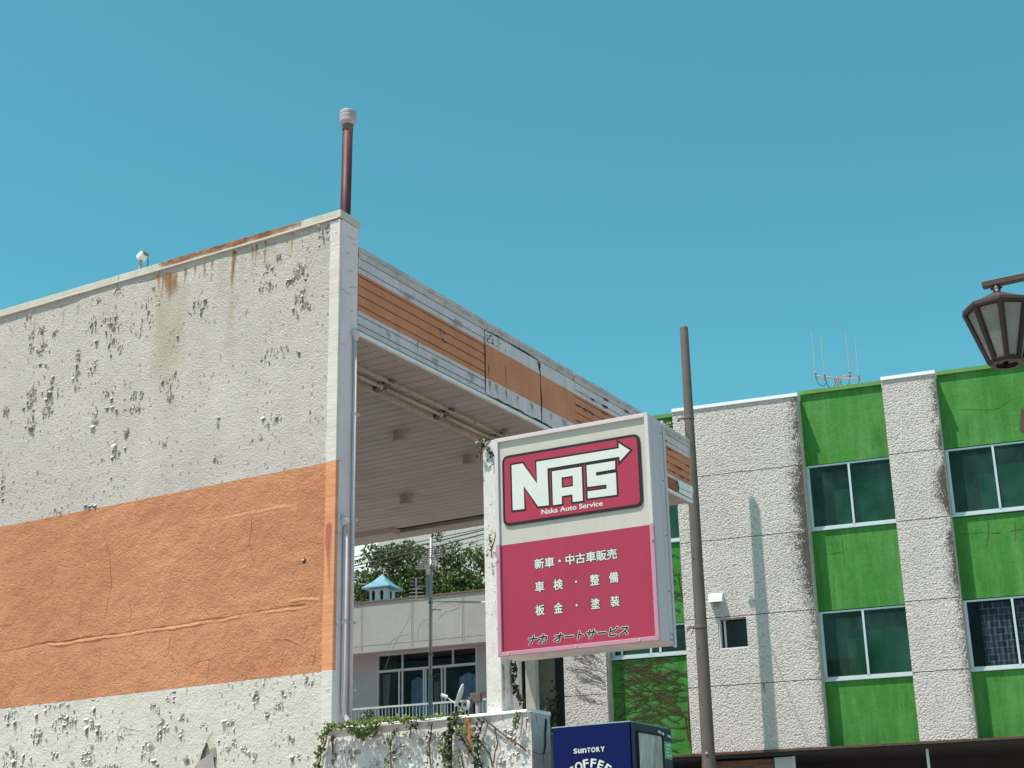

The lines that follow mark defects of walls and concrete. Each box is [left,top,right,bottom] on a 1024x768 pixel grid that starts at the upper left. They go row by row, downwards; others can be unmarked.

corrosion [157,222,299,287]
peeling [257,254,311,319]
peeling [88,285,160,358]
peeling [23,314,59,432]
peeling [72,349,97,390]
peeling [90,380,144,427]
crack [485,330,552,428]
crack [2,541,338,686]
peeling [2,700,124,768]
peeling [140,691,257,768]
peeling [252,676,313,718]